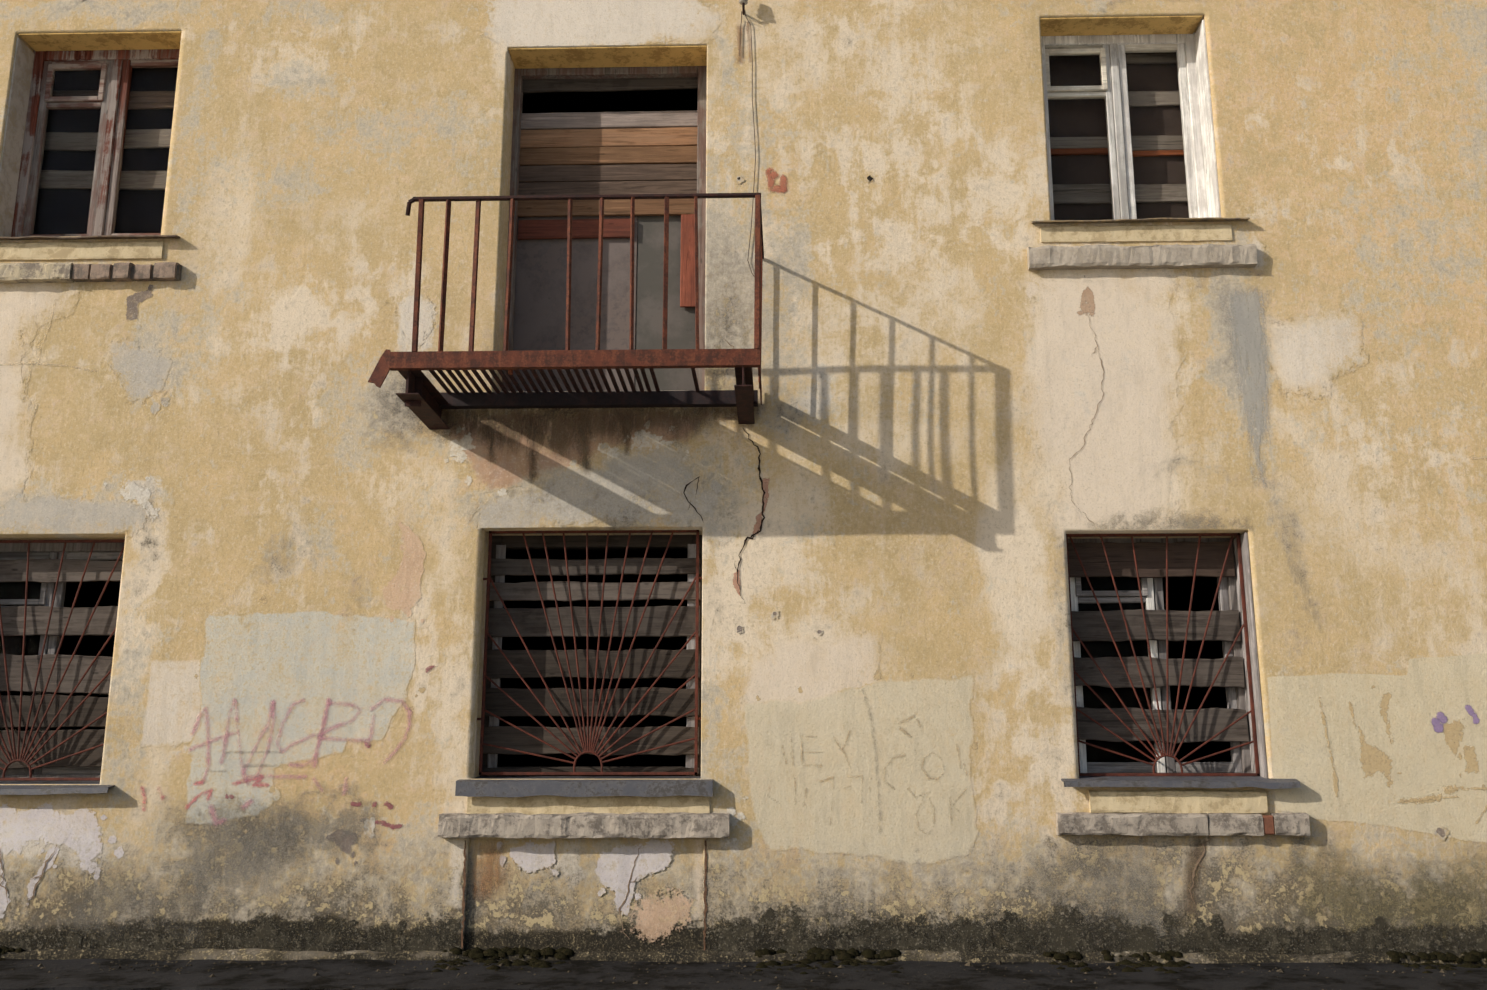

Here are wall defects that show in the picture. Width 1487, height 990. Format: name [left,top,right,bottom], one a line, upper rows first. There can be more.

peeling [476,0,722,52]
peeling [0,281,160,539]
leakage [442,407,759,478]
crack [1069,319,1104,522]
crack [717,417,769,600]
peeling [0,802,124,919]
peeling [497,838,559,877]
peeling [594,837,703,951]
leakage [1185,838,1209,914]
leakage [1305,868,1487,938]